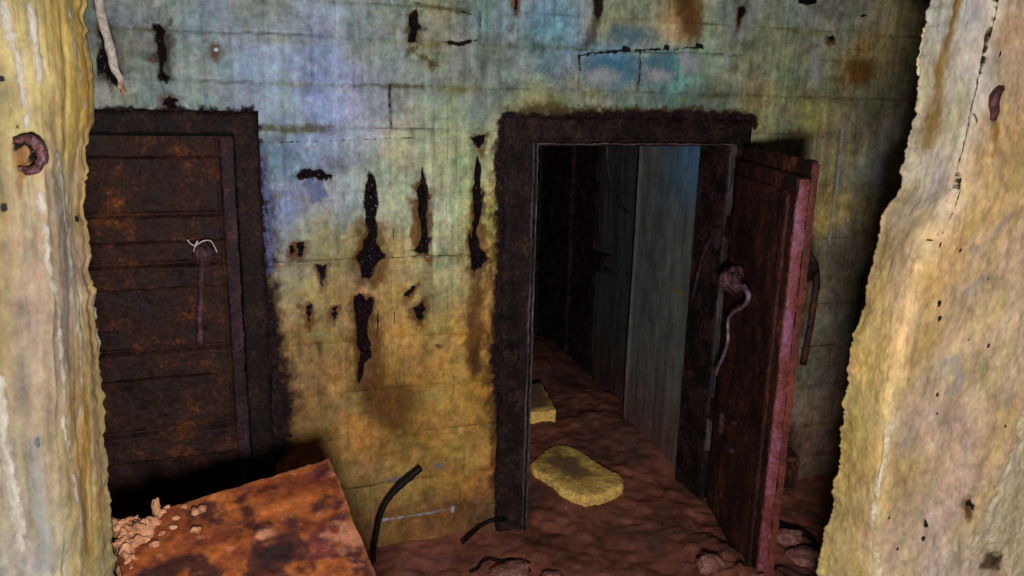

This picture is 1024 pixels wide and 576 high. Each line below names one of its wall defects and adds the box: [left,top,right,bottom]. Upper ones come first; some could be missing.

spalling [148,24,178,109]
spalling [402,9,438,68]
crack [578,43,703,84]
corrosion [675,0,702,44]
corrosion [13,141,37,187]
spalling [296,168,332,203]
spalling [328,172,387,398]
spalling [410,167,433,264]
spalling [465,133,492,377]
crack [926,0,999,247]